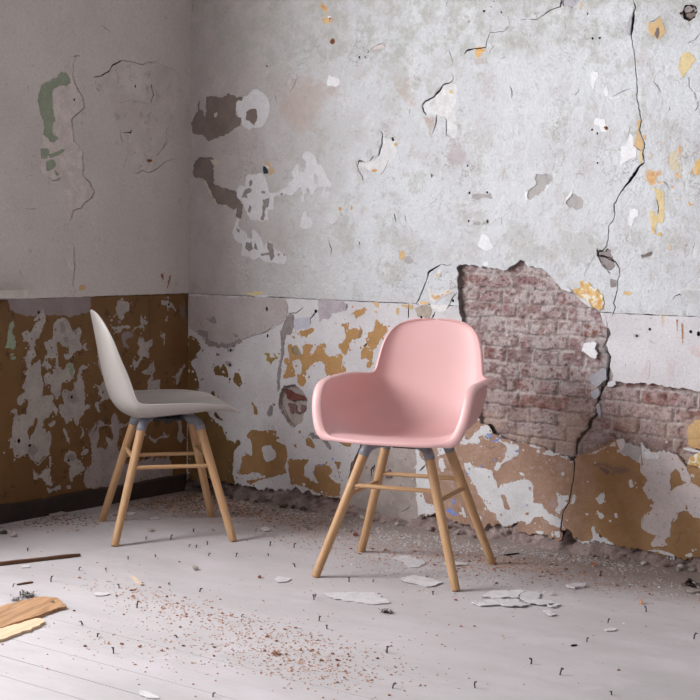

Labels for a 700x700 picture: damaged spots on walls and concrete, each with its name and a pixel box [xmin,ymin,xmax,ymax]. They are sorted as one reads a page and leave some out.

crack [524,0,579,20]
peeling [648,17,666,40]
peeling [678,52,695,77]
peeling [37,55,94,221]
spalling [191,93,243,141]
spalling [193,157,243,219]
peeling [649,187,665,236]
spalling [597,249,617,288]
crack [560,0,660,532]
peeling [3,296,173,498]
spalling [144,291,439,532]
spalling [396,260,700,572]